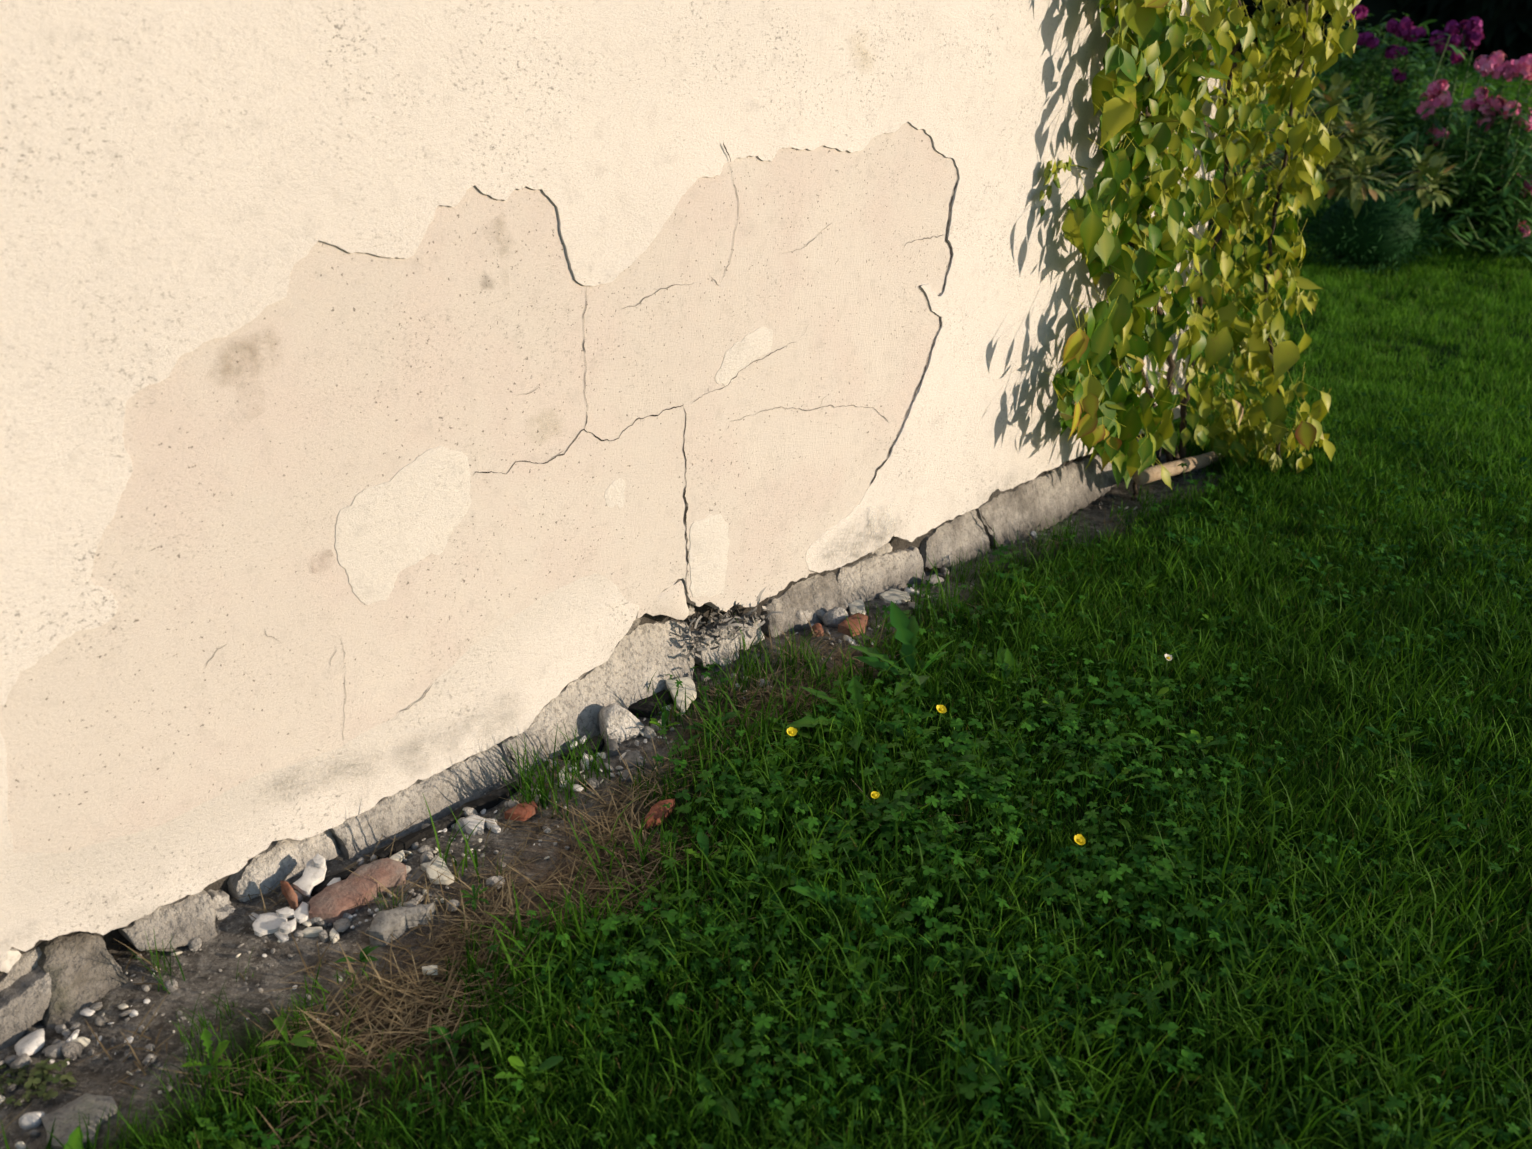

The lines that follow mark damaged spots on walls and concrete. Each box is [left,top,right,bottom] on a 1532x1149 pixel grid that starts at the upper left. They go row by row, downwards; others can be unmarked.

crack [623,143,739,309]
crack [474,176,958,594]
peeling [0,122,958,853]
spalling [0,949,21,973]
peeling [249,854,341,944]
peeling [390,850,454,885]